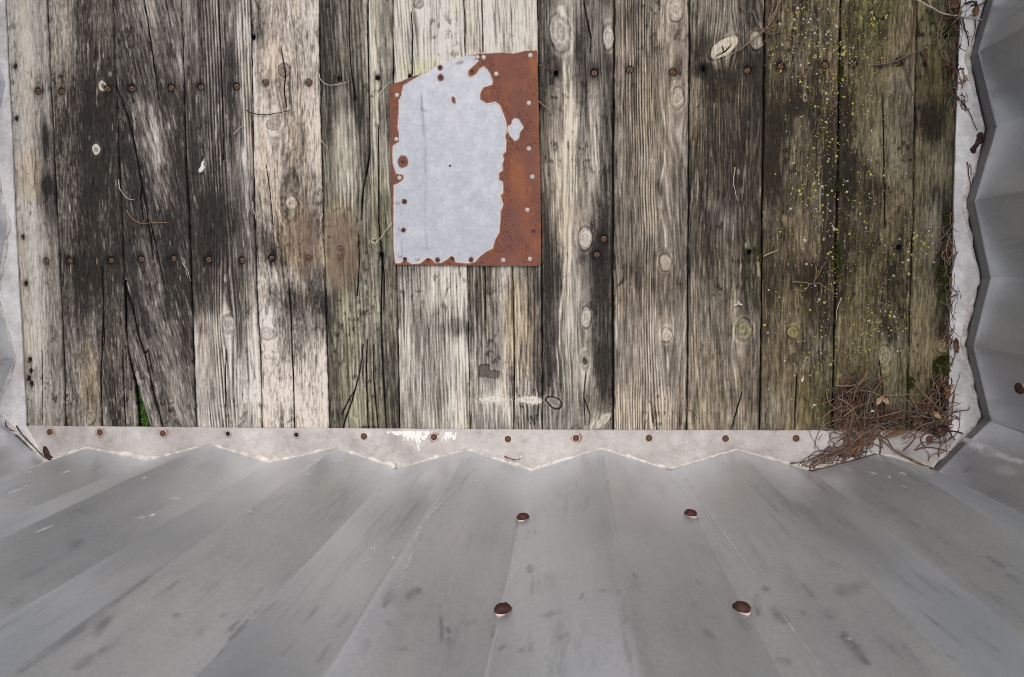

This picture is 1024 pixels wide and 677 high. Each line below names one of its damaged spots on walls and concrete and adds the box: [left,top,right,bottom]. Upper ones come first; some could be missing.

rust [389,50,541,266]
crack [100,267,164,427]